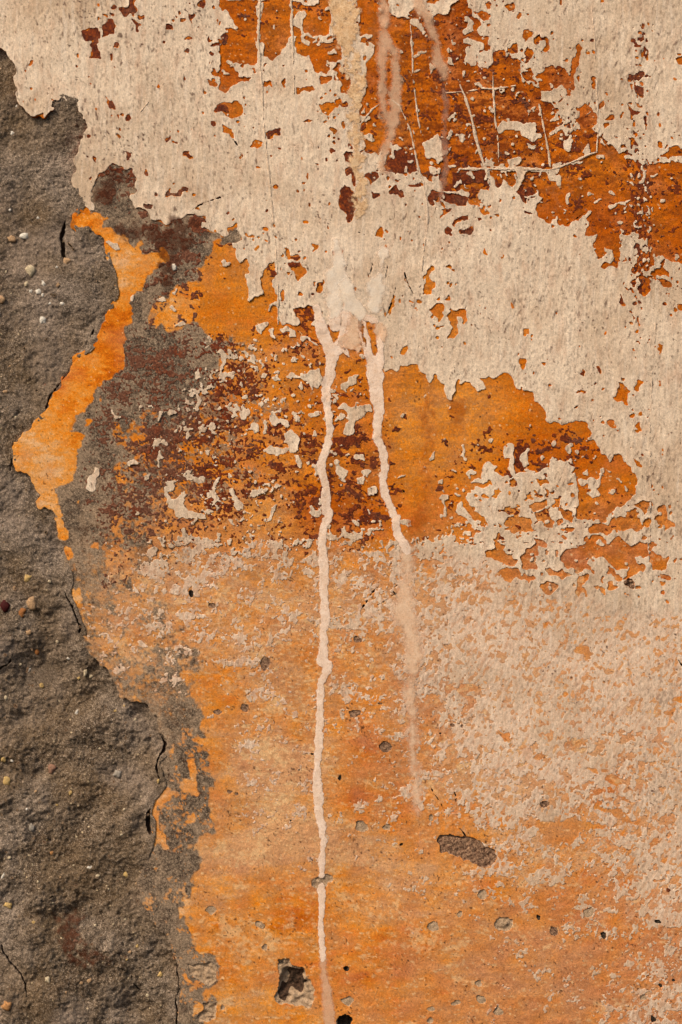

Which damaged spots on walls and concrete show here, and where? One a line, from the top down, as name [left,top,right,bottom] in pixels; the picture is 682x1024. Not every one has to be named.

peeling [76,0,145,68]
peeling [163,0,682,358]
crack [59,222,67,258]
peeling [325,320,682,610]
flaking render [0,49,326,1024]
damp [312,238,423,1024]
crack [155,736,167,778]
crack [144,809,152,835]
spalling [437,829,500,868]